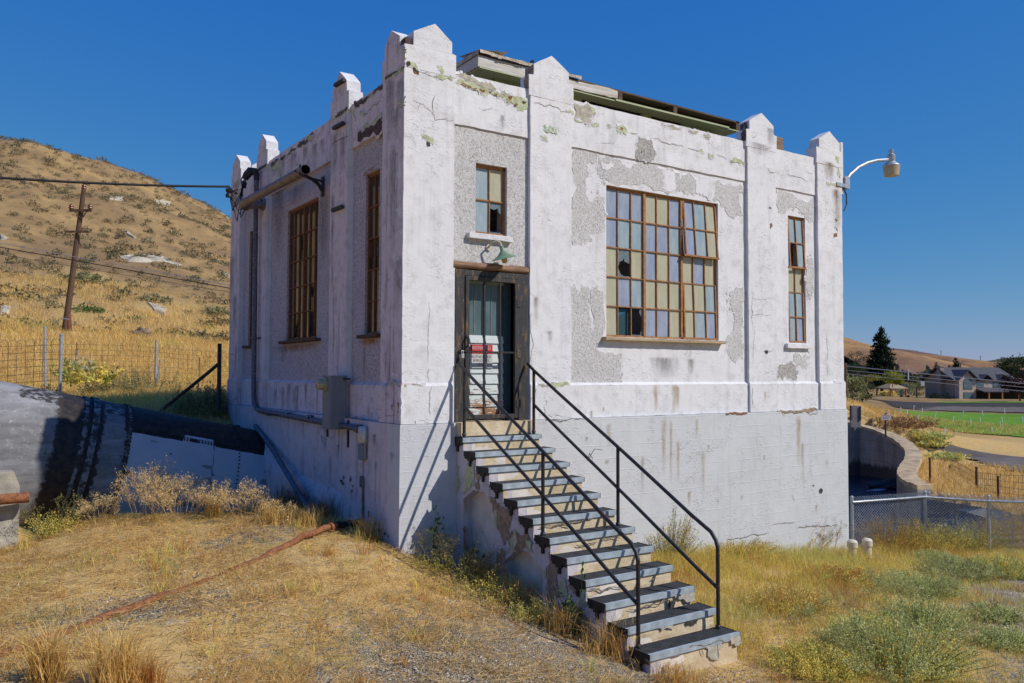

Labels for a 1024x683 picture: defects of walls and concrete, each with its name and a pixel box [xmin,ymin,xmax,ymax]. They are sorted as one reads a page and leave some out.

flaking render [332,46,421,143]
peeling [434,64,533,112]
flaking render [564,101,744,246]
flaking render [769,188,815,228]
flaking render [538,284,623,418]
flaking render [726,286,746,363]
flaking render [777,349,810,382]
peeling [490,497,533,586]